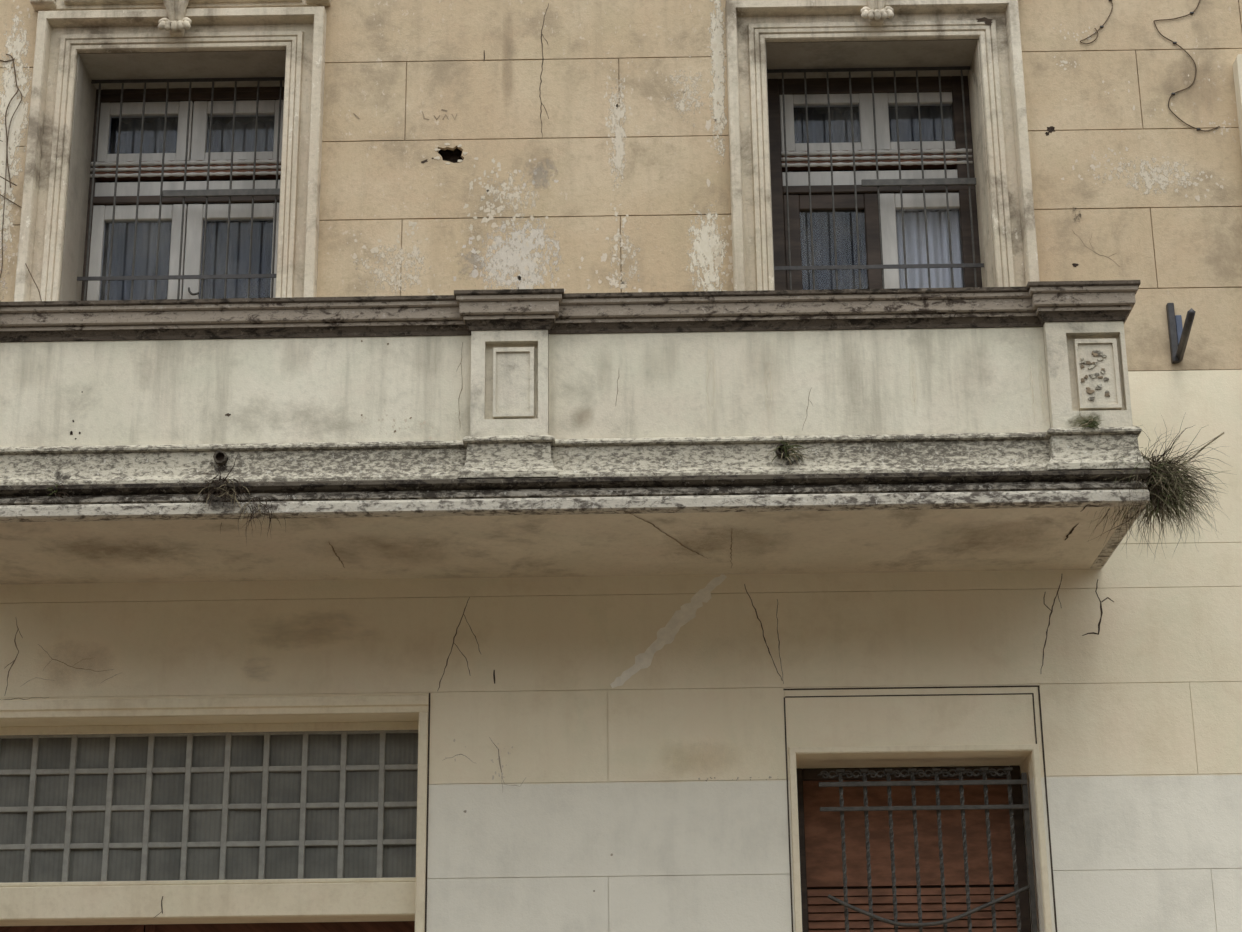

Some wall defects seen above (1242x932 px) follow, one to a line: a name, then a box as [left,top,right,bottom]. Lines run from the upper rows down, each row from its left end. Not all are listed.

peeling [0,0,32,294]
peeling [347,62,642,296]
crack [539,3,549,137]
peeling [654,0,727,187]
peeling [686,201,733,291]
crack [4,619,120,700]
crack [438,597,495,690]
crack [610,510,784,688]
crack [1041,576,1062,668]
crack [1082,580,1114,636]